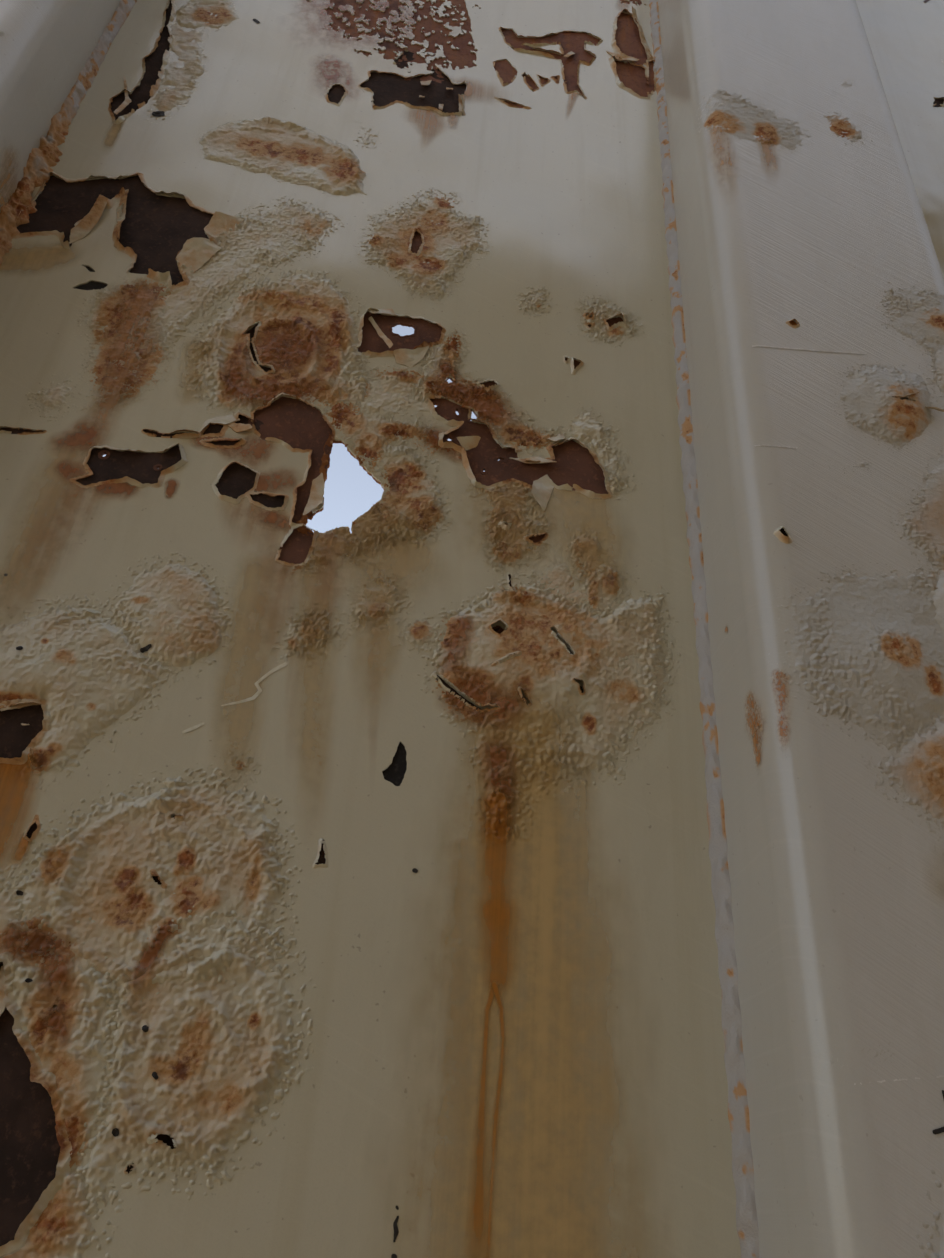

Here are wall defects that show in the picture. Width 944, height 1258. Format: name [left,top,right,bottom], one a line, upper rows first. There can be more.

peeling [324,0,480,117]
peeling [492,0,656,109]
peeling [12,172,244,291]
peeling [240,321,275,375]
peeling [356,308,446,368]
peeling [69,443,188,489]
peeling [197,393,335,567]
peeling [425,391,613,511]
peeling [0,699,51,765]
corrosion [747,695,762,764]
corrosion [473,744,513,1251]
peeling [0,952,72,1258]